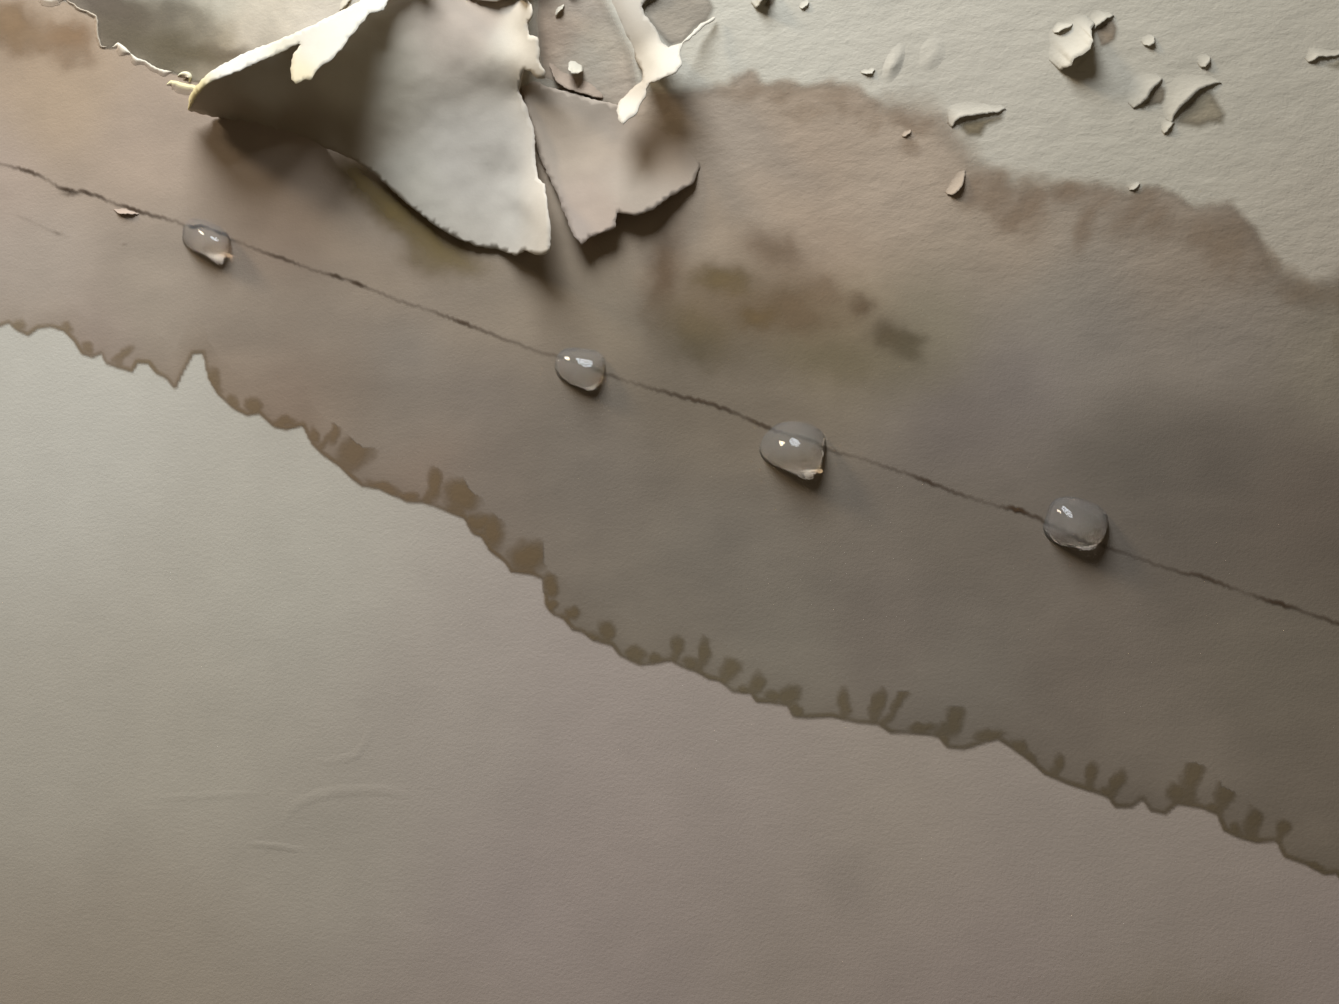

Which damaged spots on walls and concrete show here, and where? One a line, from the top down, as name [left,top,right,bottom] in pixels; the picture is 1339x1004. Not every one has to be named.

peeling [1048,10,1115,70]
peeling [38,0,716,256]
peeling [947,102,1006,134]
peeling [1127,54,1223,134]
crack [20,168,152,216]
crack [680,396,771,430]
damp [308,425,368,484]
damp [447,482,504,560]
crack [1006,506,1040,519]
crack [1265,599,1293,607]
damp [977,730,1126,806]
damp [1168,763,1265,842]